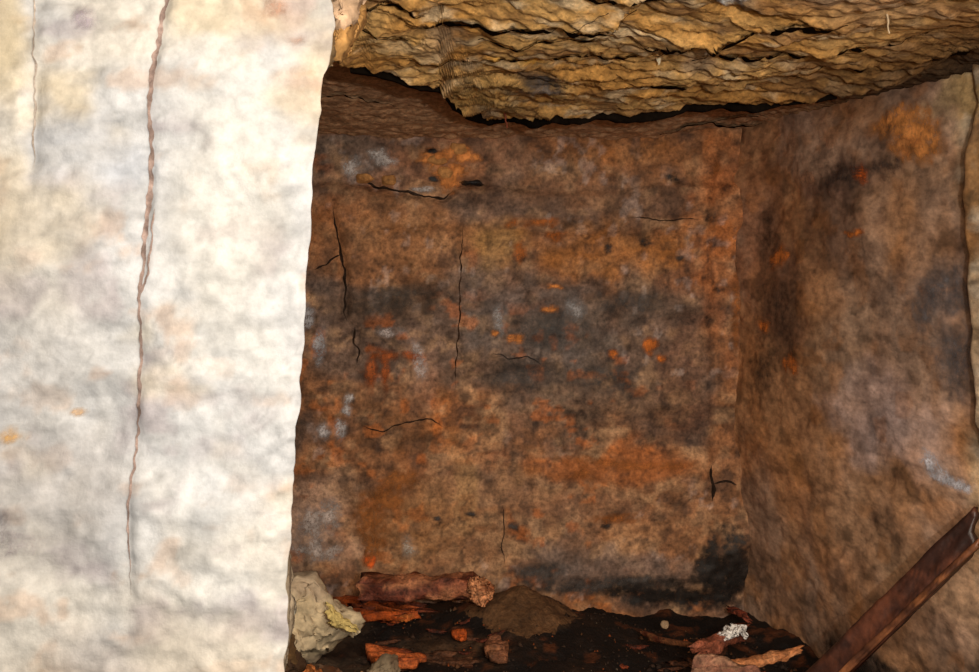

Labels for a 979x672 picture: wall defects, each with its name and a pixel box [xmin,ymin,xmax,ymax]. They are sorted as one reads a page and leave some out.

crack [368,179,484,200]
crack [126,0,169,582]
crack [316,211,360,362]
crack [455,225,464,384]